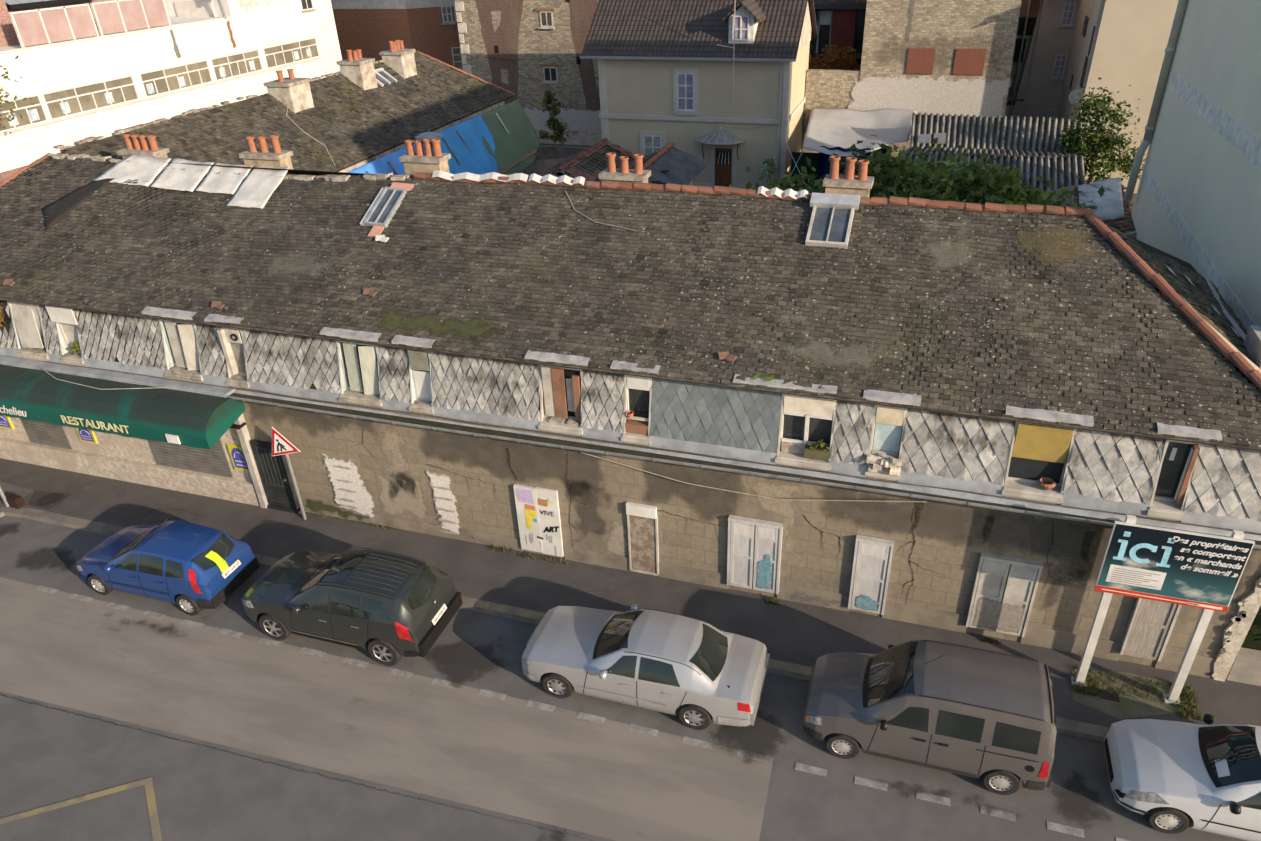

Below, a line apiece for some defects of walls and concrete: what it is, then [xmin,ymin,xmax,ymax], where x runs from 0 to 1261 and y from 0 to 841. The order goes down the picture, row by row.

leakage [382,428,416,496]
crack [895,499,940,604]